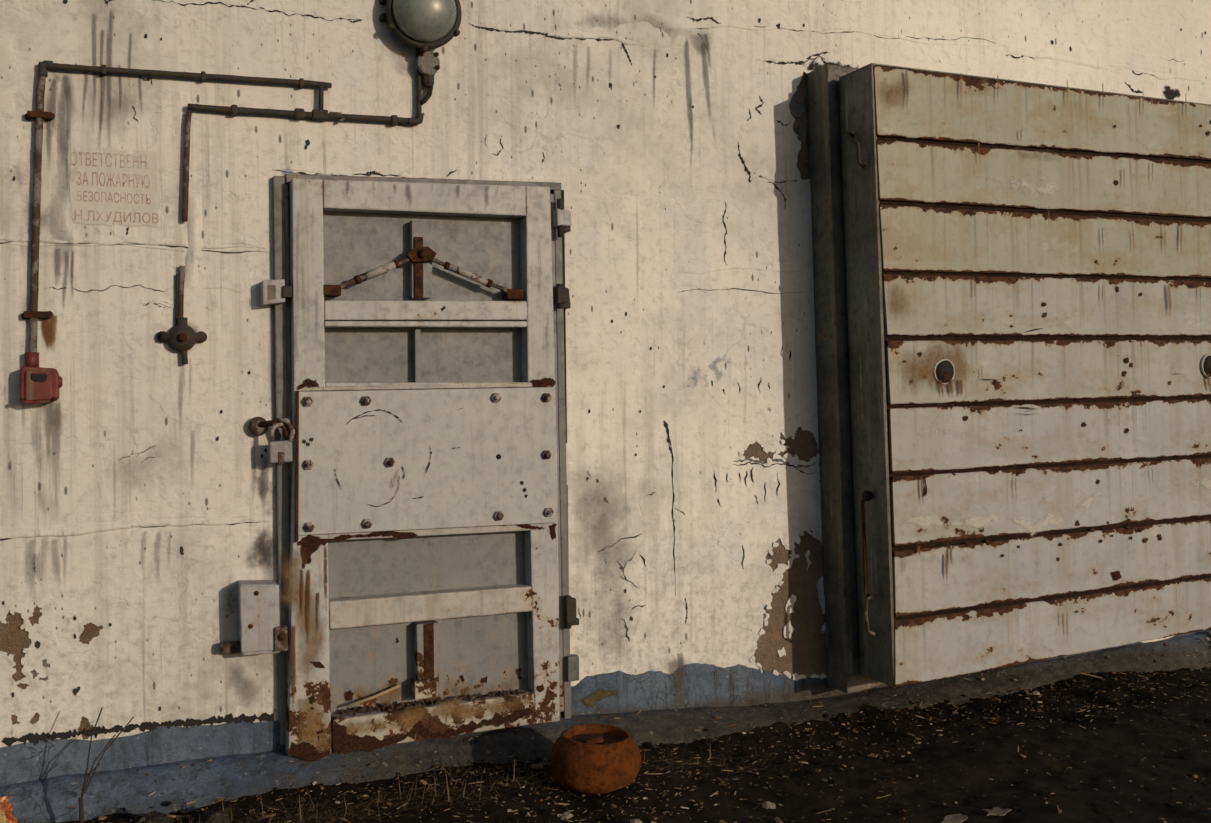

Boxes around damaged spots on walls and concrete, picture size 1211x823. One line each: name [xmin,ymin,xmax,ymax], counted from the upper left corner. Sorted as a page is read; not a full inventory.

crack [469,17,1034,65]
crack [1106,57,1211,93]
peeling [714,426,819,507]
peeling [749,528,827,681]
peeling [0,601,50,697]
peeling [11,712,40,725]
corrosion [287,675,544,762]